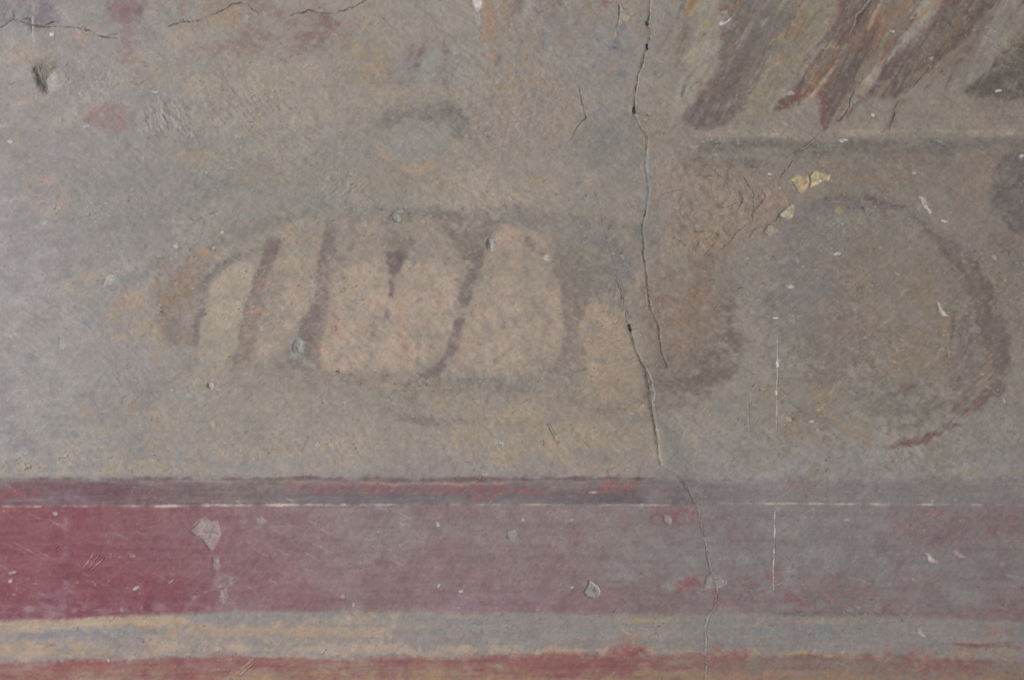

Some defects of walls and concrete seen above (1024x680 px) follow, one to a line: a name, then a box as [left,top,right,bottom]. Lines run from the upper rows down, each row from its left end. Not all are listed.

crack [0,11,119,40]
crack [166,2,258,28]
crack [288,0,366,17]
crack [593,0,720,680]
peeling [188,516,242,605]